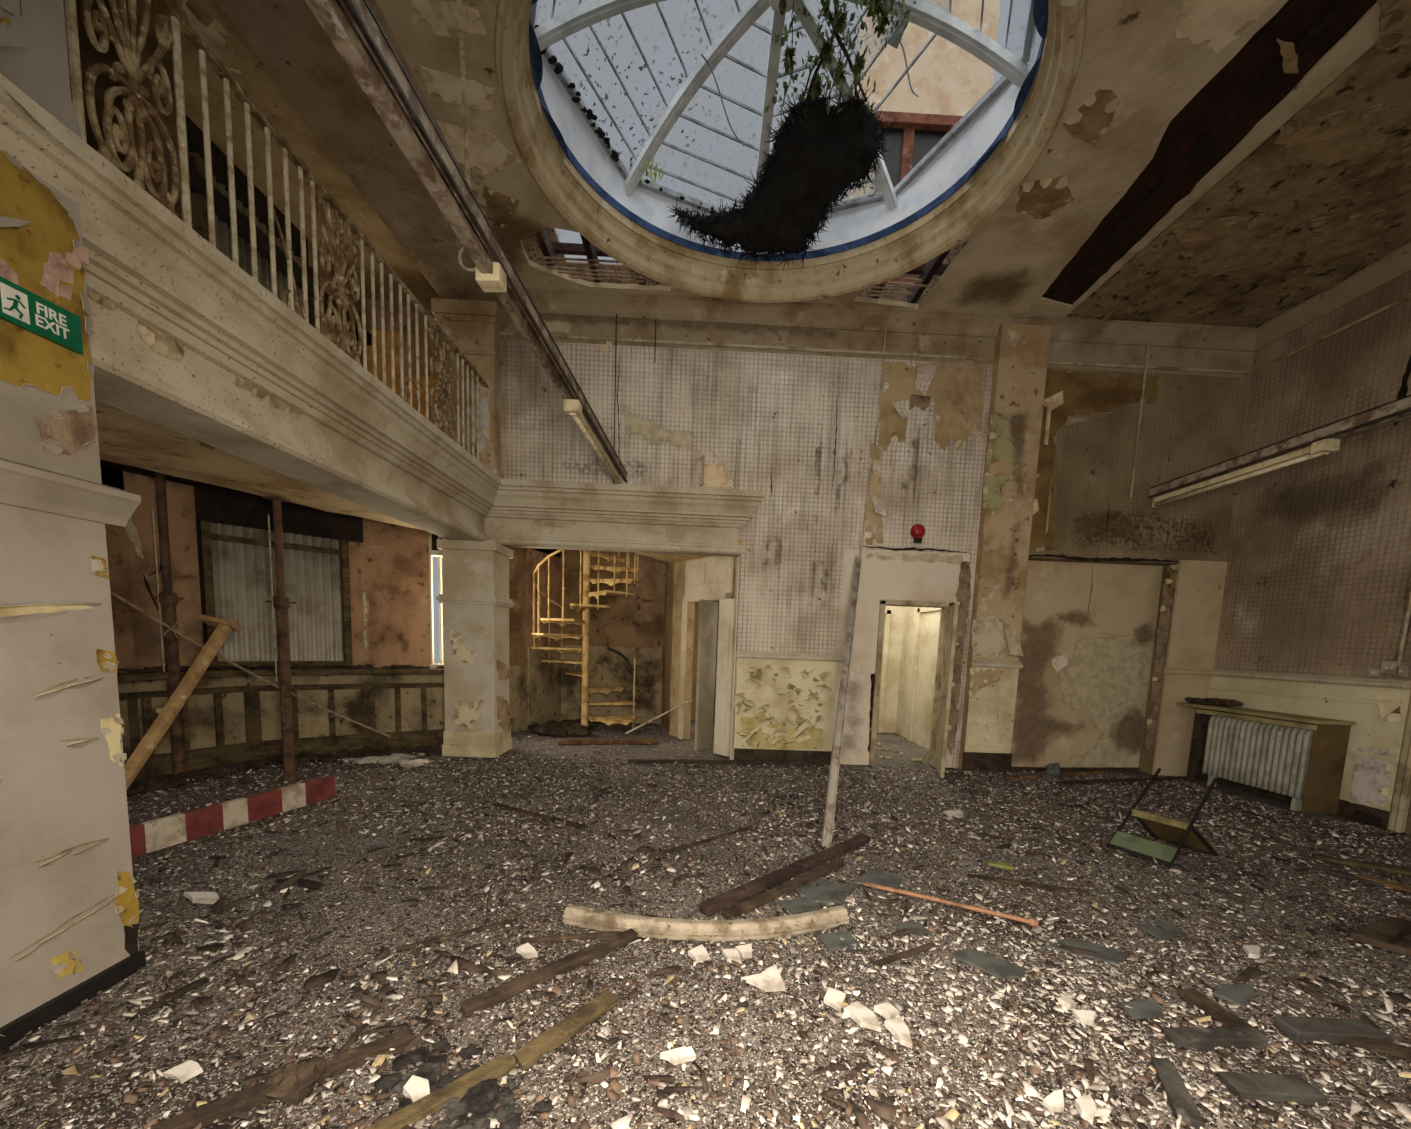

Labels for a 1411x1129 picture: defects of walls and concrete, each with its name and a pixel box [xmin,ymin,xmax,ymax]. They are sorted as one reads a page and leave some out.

peeling [1176,0,1276,53]
peeling [0,30,83,156]
peeling [1062,90,1119,147]
peeling [1015,174,1075,219]
peeling [0,149,122,456]
flaking render [953,410,1040,516]
peeling [96,649,119,673]
peeling [100,713,127,767]
peeling [732,665,832,750]
leakage [1013,613,1089,761]
leakage [1115,711,1144,752]
peeling [114,871,140,956]